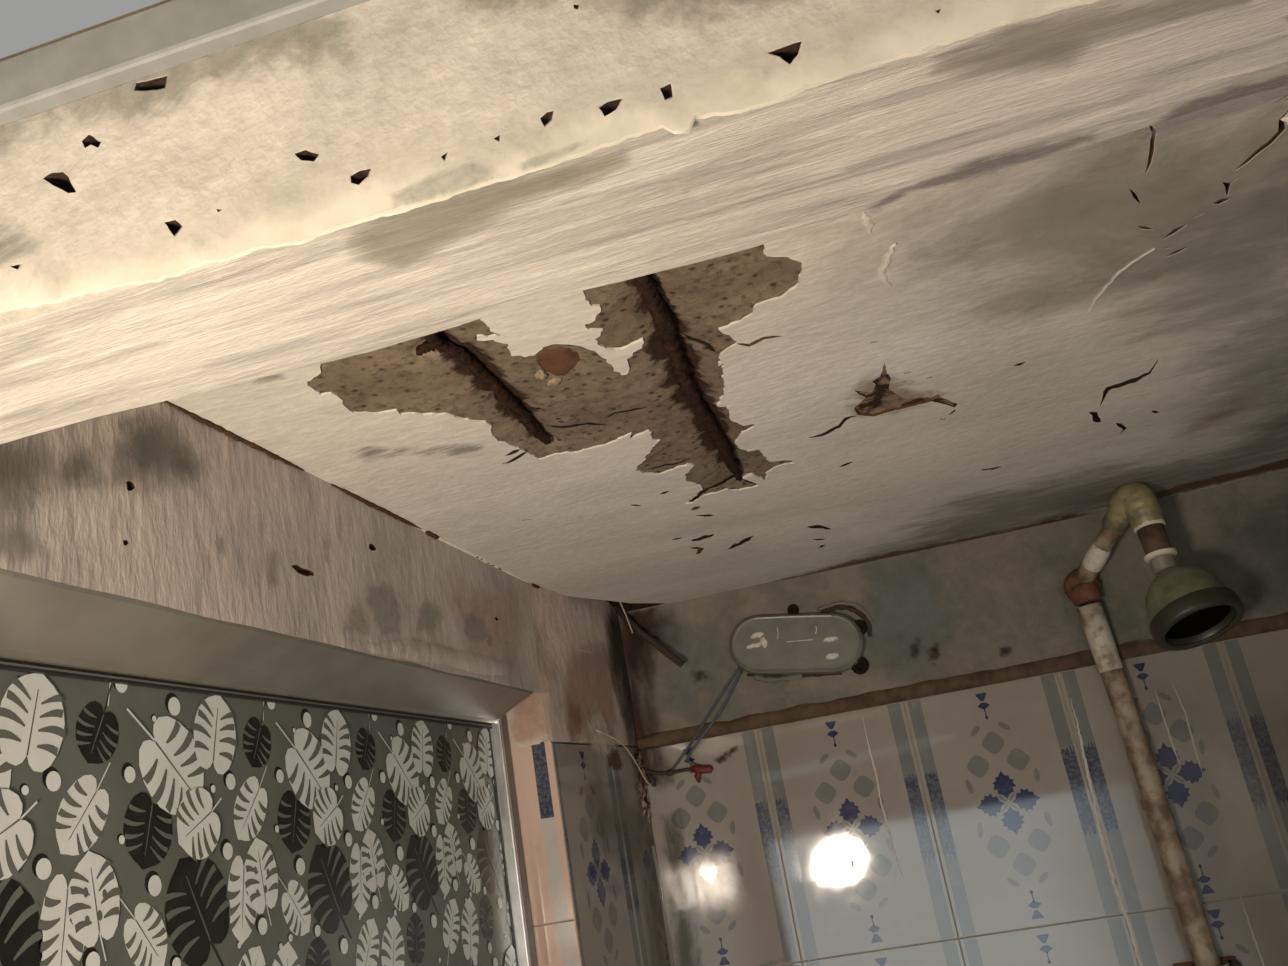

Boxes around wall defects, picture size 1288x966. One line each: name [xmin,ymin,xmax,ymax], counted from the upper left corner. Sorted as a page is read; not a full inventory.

peeling [0,0,1100,313]
crack [1214,96,1288,204]
crack [1088,126,1187,313]
damp [121,425,194,477]
spalling [307,243,803,517]
crack [737,336,781,347]
spalling [809,363,958,438]
crack [1090,359,1159,433]
peeling [672,534,714,554]
damp [607,607,722,795]